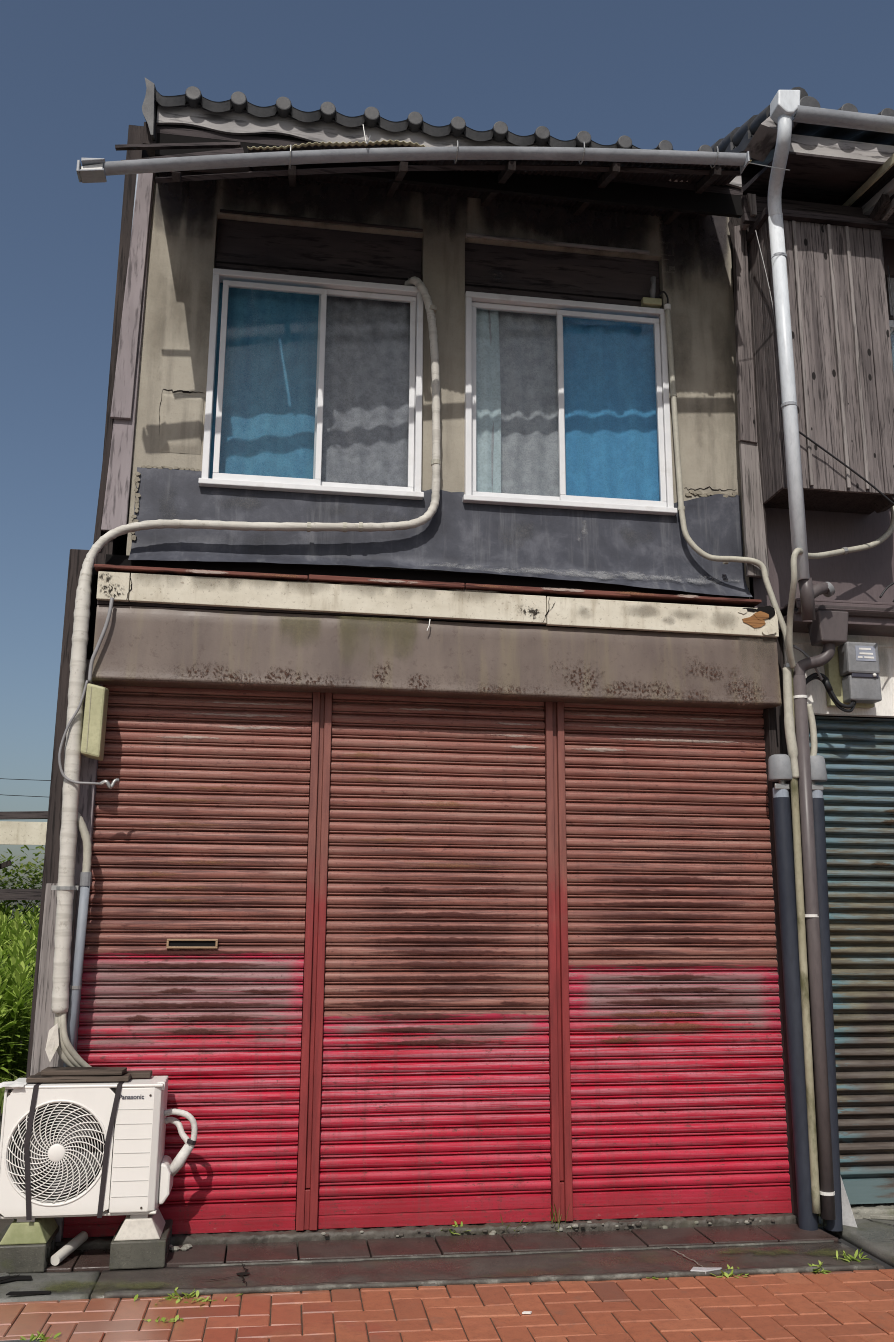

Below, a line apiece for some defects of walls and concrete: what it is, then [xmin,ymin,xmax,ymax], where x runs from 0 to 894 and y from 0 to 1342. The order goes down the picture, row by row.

crack [159,389,203,432]
spalling [738,606,777,635]
rust [552,665,708,702]